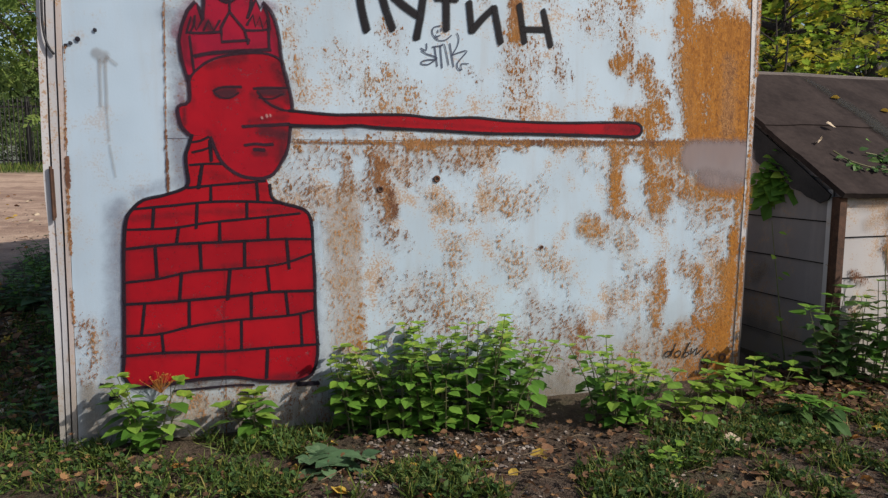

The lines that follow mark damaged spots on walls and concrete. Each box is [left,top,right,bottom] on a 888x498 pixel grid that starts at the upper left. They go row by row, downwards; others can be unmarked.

rust [63,46,73,256]
rust [162,2,171,192]
rust [268,0,762,384]
rust [67,290,120,390]